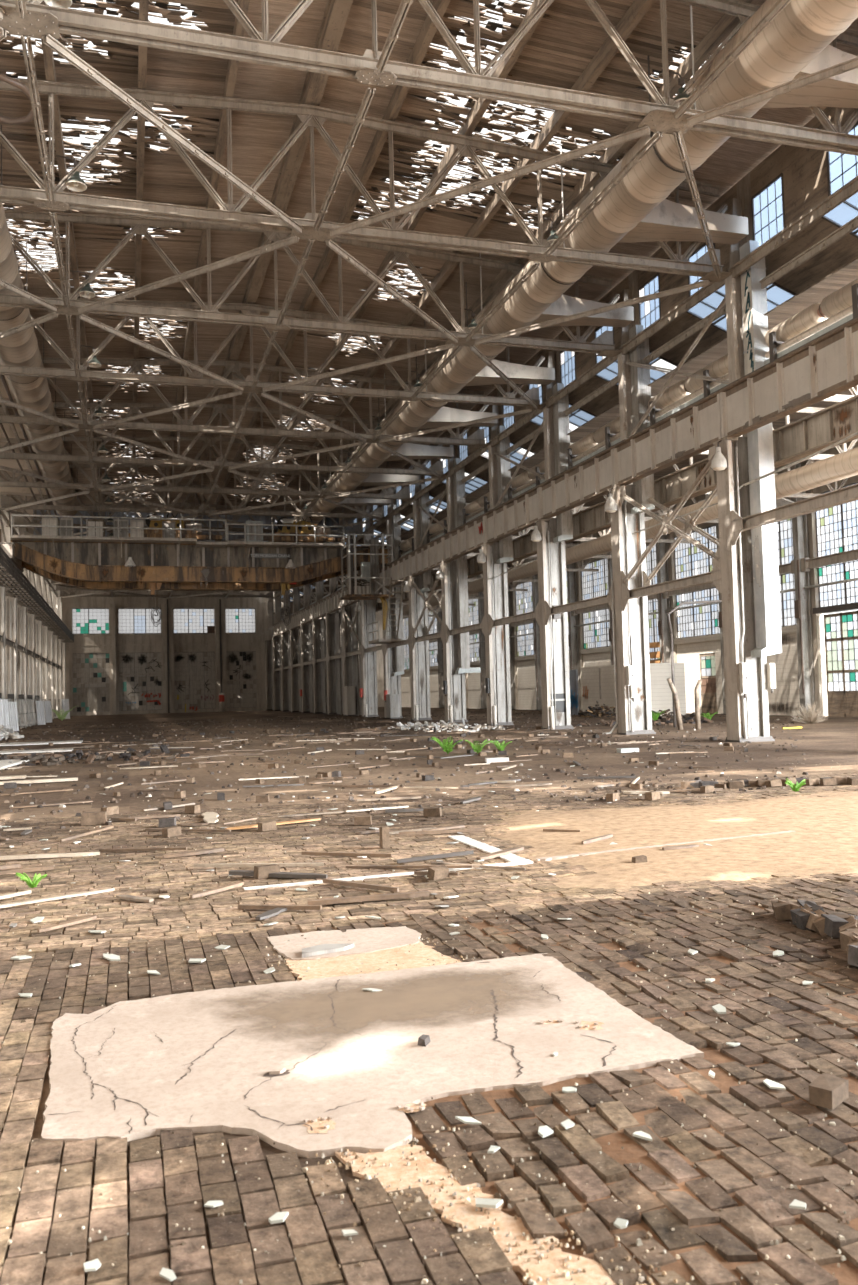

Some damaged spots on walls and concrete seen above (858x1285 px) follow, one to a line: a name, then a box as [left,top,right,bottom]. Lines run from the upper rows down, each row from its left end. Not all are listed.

crack [48,1005,157,1134]
crack [153,1029,236,1084]
crack [490,989,524,1078]